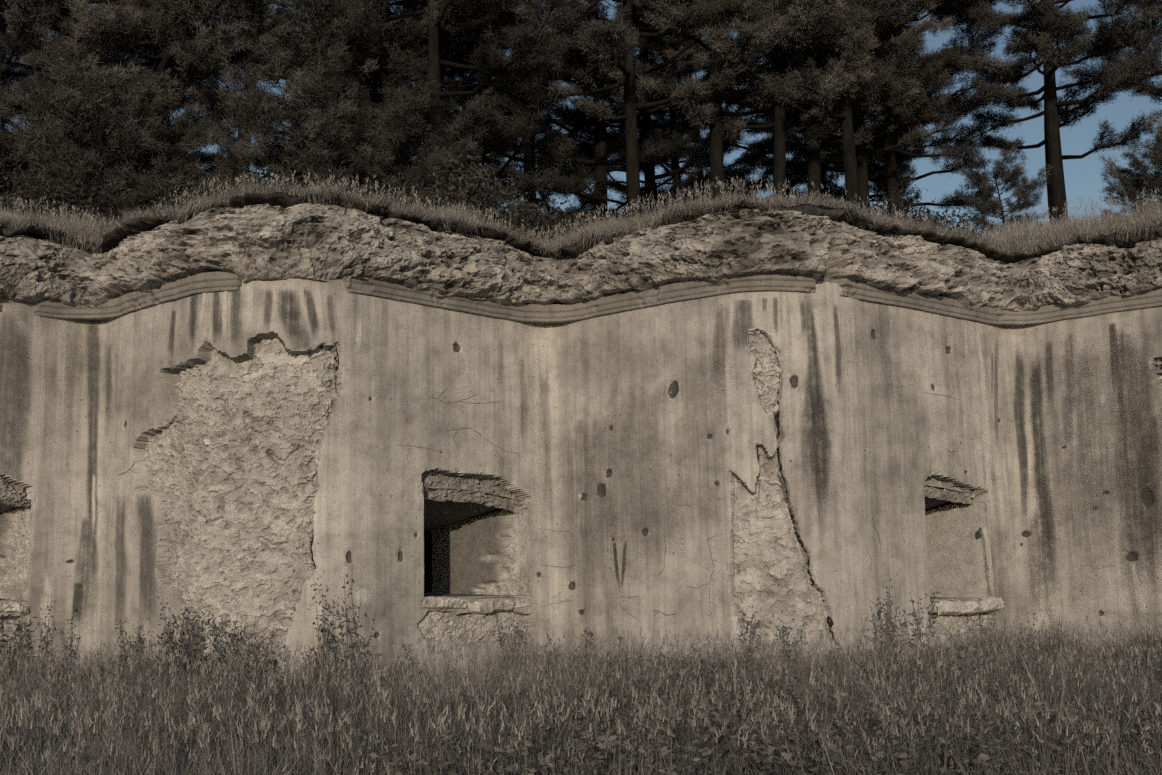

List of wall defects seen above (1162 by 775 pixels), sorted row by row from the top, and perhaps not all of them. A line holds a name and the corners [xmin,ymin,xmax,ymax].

spalling [0,203,1162,312]
damp [1110,324,1146,373]
spalling [668,381,679,398]
damp [1015,348,1054,559]
spalling [0,476,31,507]
spalling [143,338,338,675]
spalling [422,471,527,513]
crack [731,333,839,650]
spalling [924,471,979,504]
spalling [732,447,835,666]
spalling [417,611,531,646]
spalling [928,612,993,635]